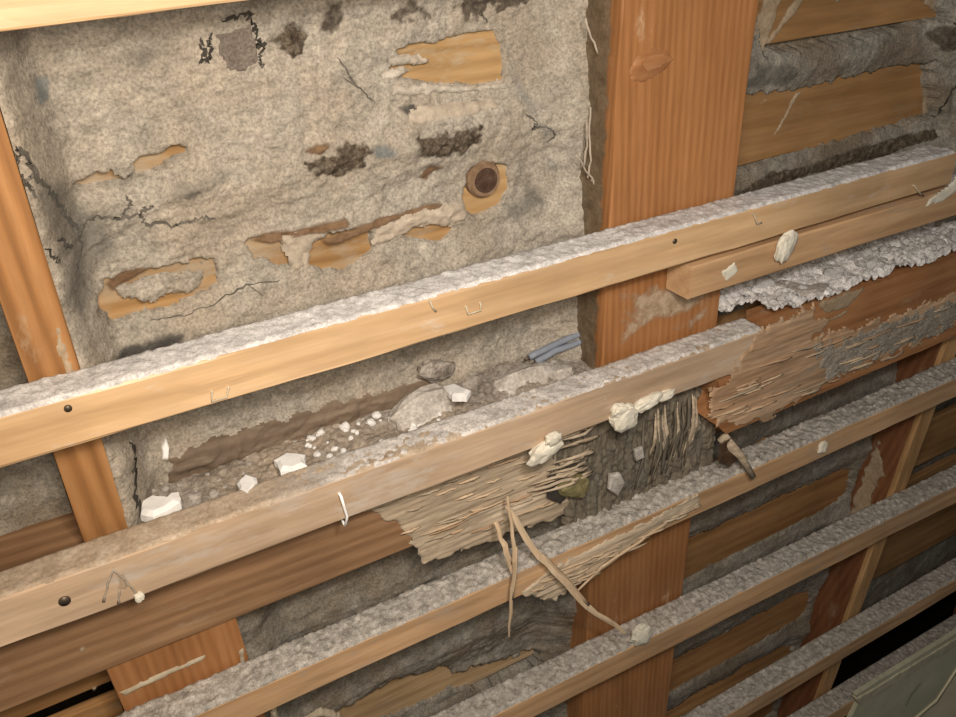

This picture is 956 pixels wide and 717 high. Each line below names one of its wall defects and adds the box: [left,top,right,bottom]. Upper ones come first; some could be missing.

flaking render [389,0,527,91]
crack [937,86,956,115]
flaking render [74,144,185,184]
flaking render [407,98,498,179]
crack [13,146,216,275]
flaking render [245,228,371,269]
flaking render [98,257,217,319]
peeling [443,384,471,402]
flaking render [161,379,431,483]